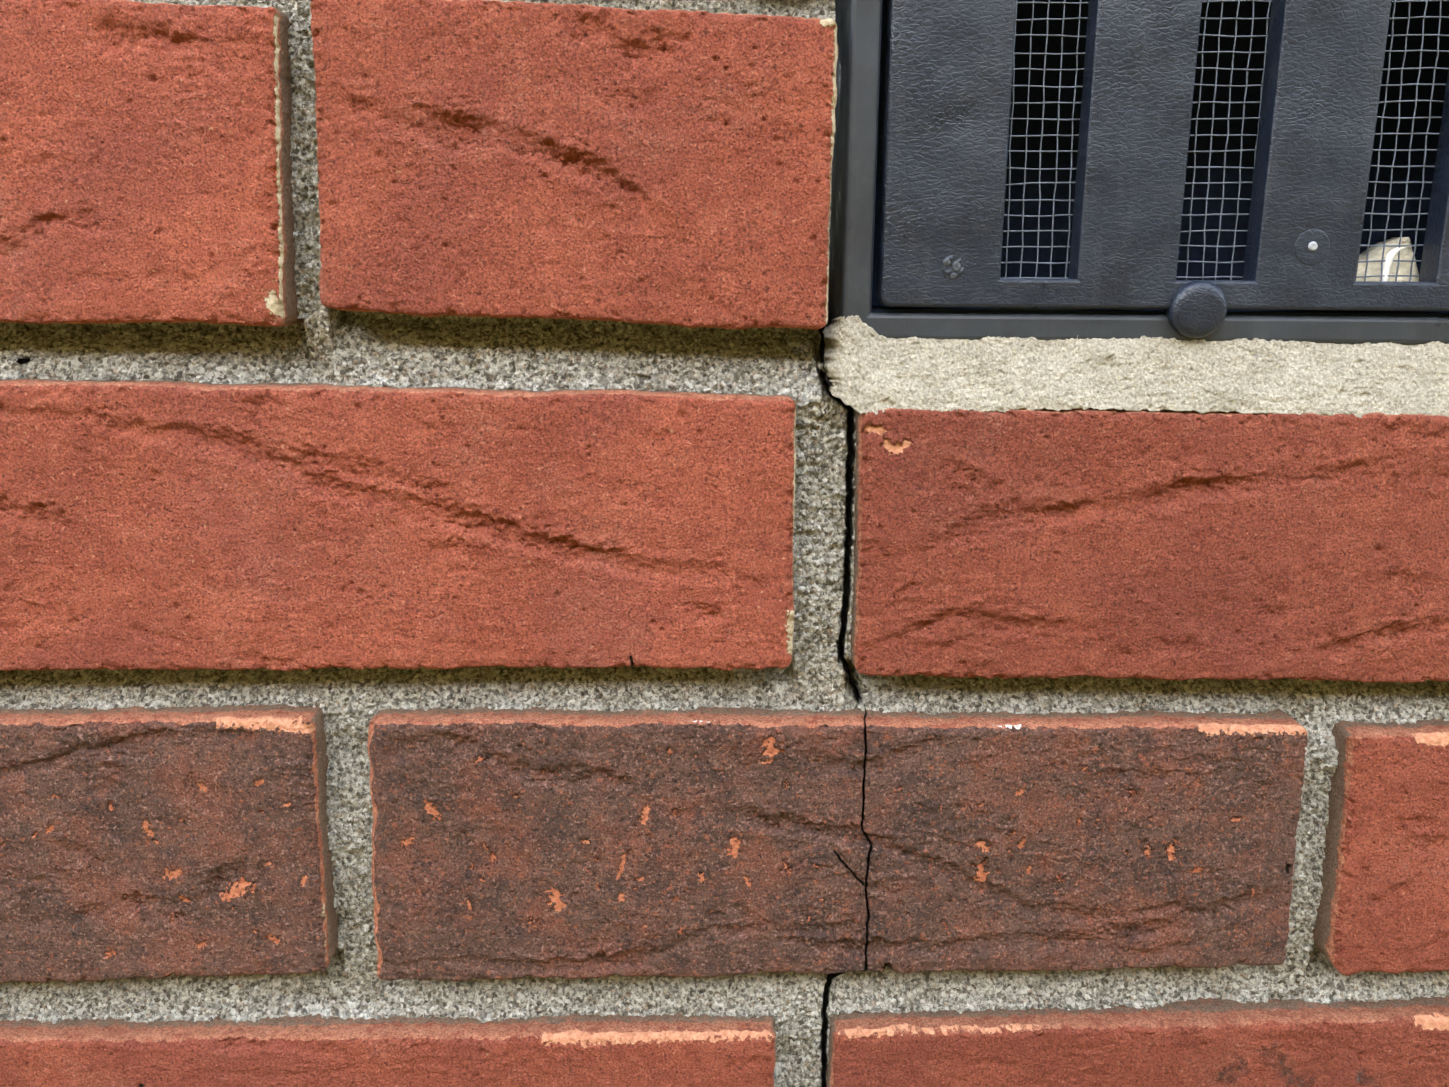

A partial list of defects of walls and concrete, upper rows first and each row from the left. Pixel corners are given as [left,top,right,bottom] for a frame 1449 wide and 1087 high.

crack [818,326,872,1087]